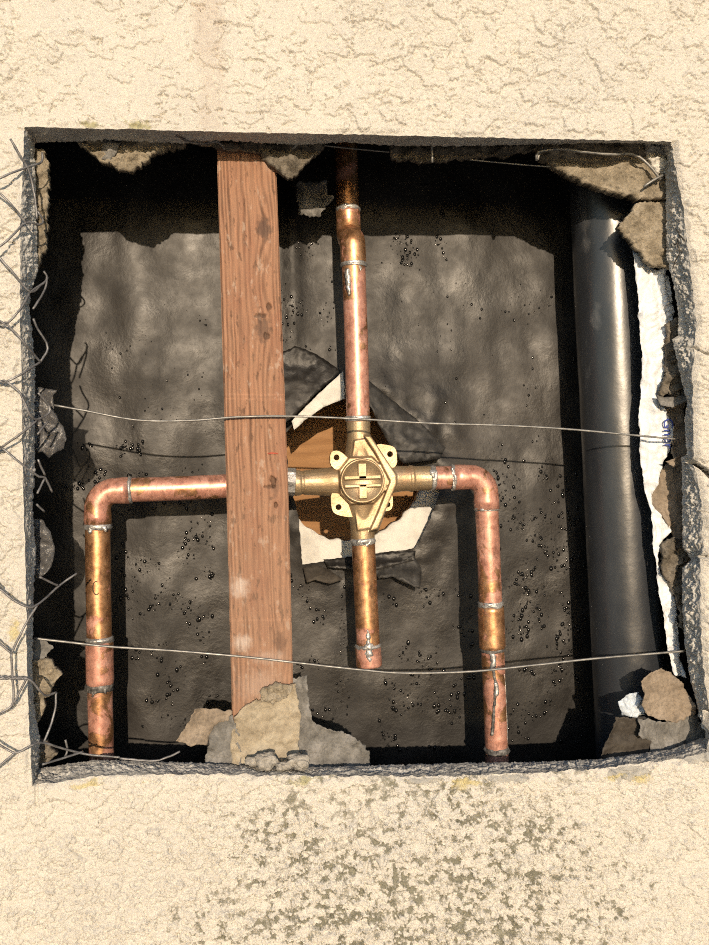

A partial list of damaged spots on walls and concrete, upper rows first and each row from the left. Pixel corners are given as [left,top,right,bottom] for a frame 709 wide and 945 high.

spalling [77,139,325,181]
spalling [34,148,52,270]
spalling [389,143,669,270]
spalling [657,317,687,403]
crack [692,464,709,478]
spalling [659,536,691,630]
spalling [32,656,63,723]
spalling [38,737,59,769]
spalling [230,681,301,767]